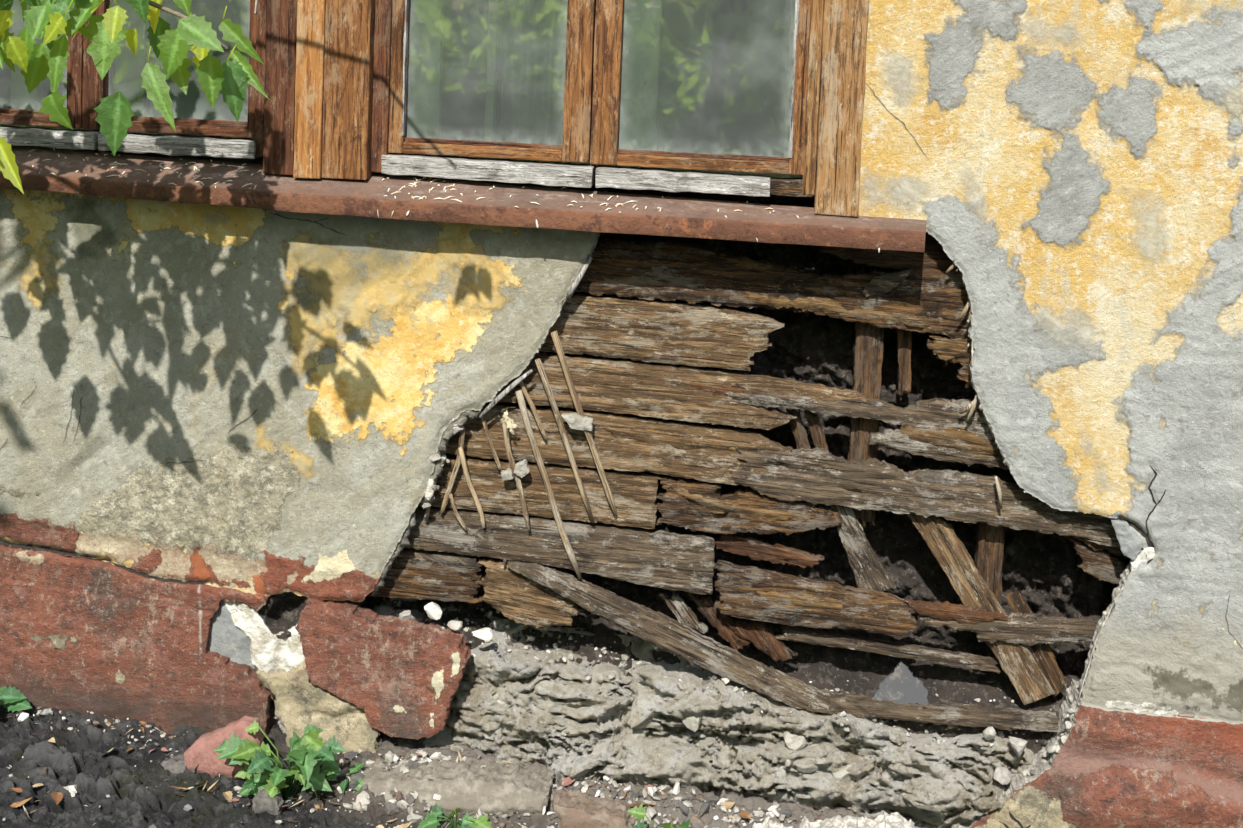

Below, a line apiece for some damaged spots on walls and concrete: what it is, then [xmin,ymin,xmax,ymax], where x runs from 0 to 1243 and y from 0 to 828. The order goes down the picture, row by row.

peeling [0,188,276,307]
flaking render [560,234,599,312]
flaking render [862,267,914,297]
flaking render [561,412,593,431]
flaking render [946,259,1013,509]
flaking render [0,222,533,754]
crack [1120,465,1166,564]
crack [0,539,207,584]
spalling [975,518,1155,828]
flaking render [1105,699,1195,719]
water stain [1144,666,1243,712]
crack [999,812,1031,828]